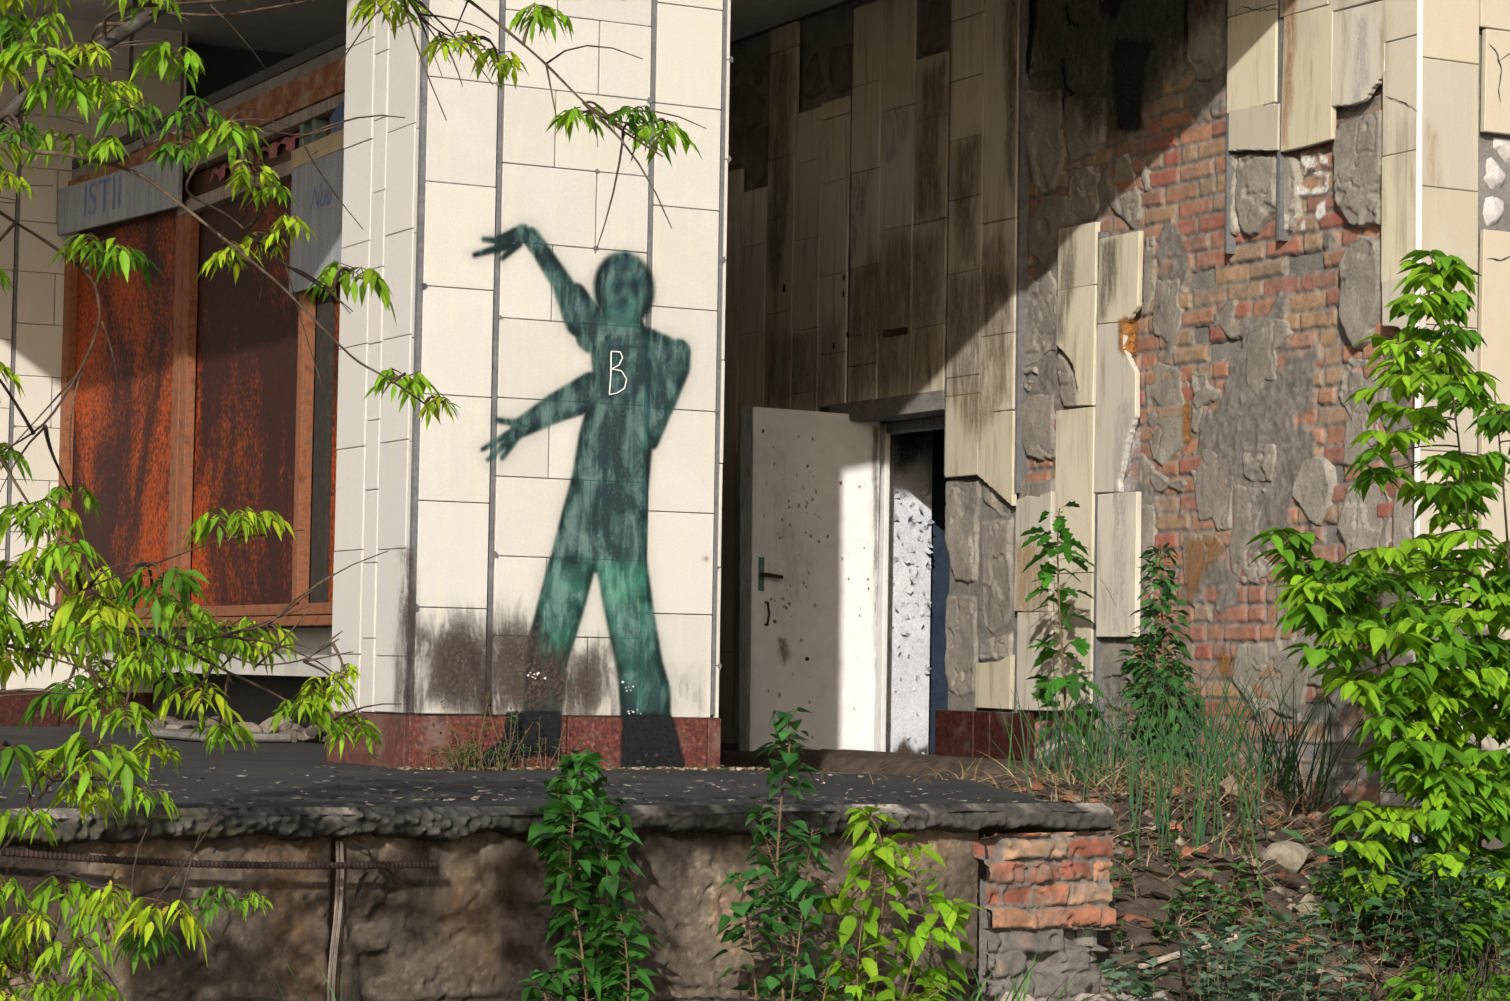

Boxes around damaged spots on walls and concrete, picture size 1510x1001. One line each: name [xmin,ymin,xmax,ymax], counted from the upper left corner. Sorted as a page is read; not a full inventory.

flaking render [920,0,950,56]
leakage [1006,0,1020,178]
flaking render [1187,0,1227,83]
crack [1490,45,1510,102]
flaking render [1021,0,1185,461]
flaking render [1230,153,1305,236]
flaking render [1213,299,1295,395]
flaking render [1292,110,1414,576]
leakage [400,551,609,727]
flaking render [888,477,1055,700]
flaking render [1102,363,1338,719]
flaking render [1346,655,1377,706]